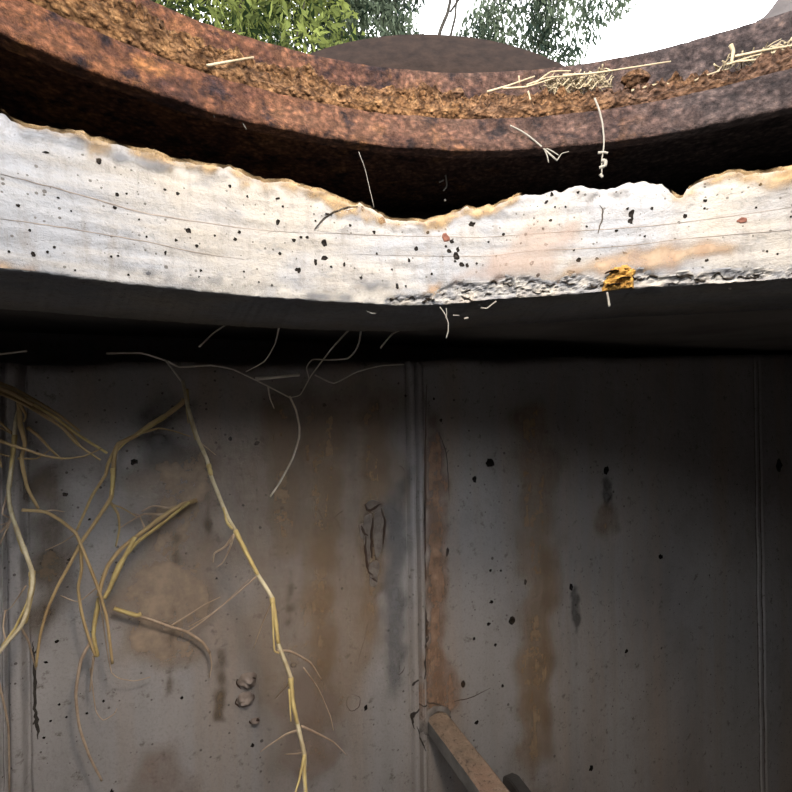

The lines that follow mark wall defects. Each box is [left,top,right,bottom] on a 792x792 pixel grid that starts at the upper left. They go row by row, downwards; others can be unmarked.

spalling [383,273,605,306]
rust [591,242,733,292]
crack [32,643,40,740]